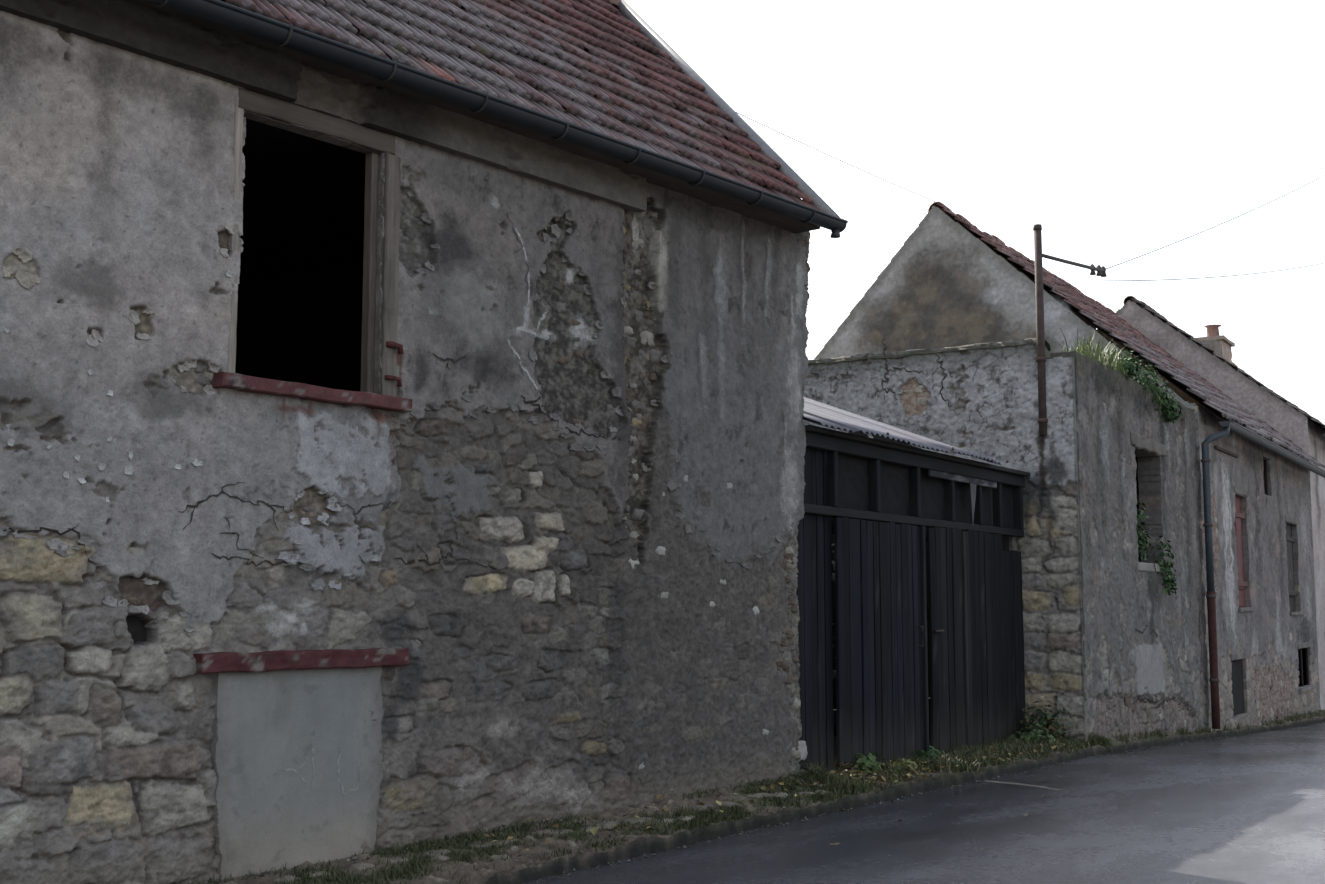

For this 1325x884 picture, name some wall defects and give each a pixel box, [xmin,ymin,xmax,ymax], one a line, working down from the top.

spalling [2,247,42,289]
spalling [218,223,244,278]
spalling [380,177,440,277]
spalling [123,307,156,340]
crack [507,213,608,438]
spalling [170,360,222,394]
spalling [392,198,669,562]
spalling [895,377,931,418]
flaking render [0,507,109,564]
crack [178,482,292,566]
spalling [275,486,352,591]
spalling [87,568,197,637]